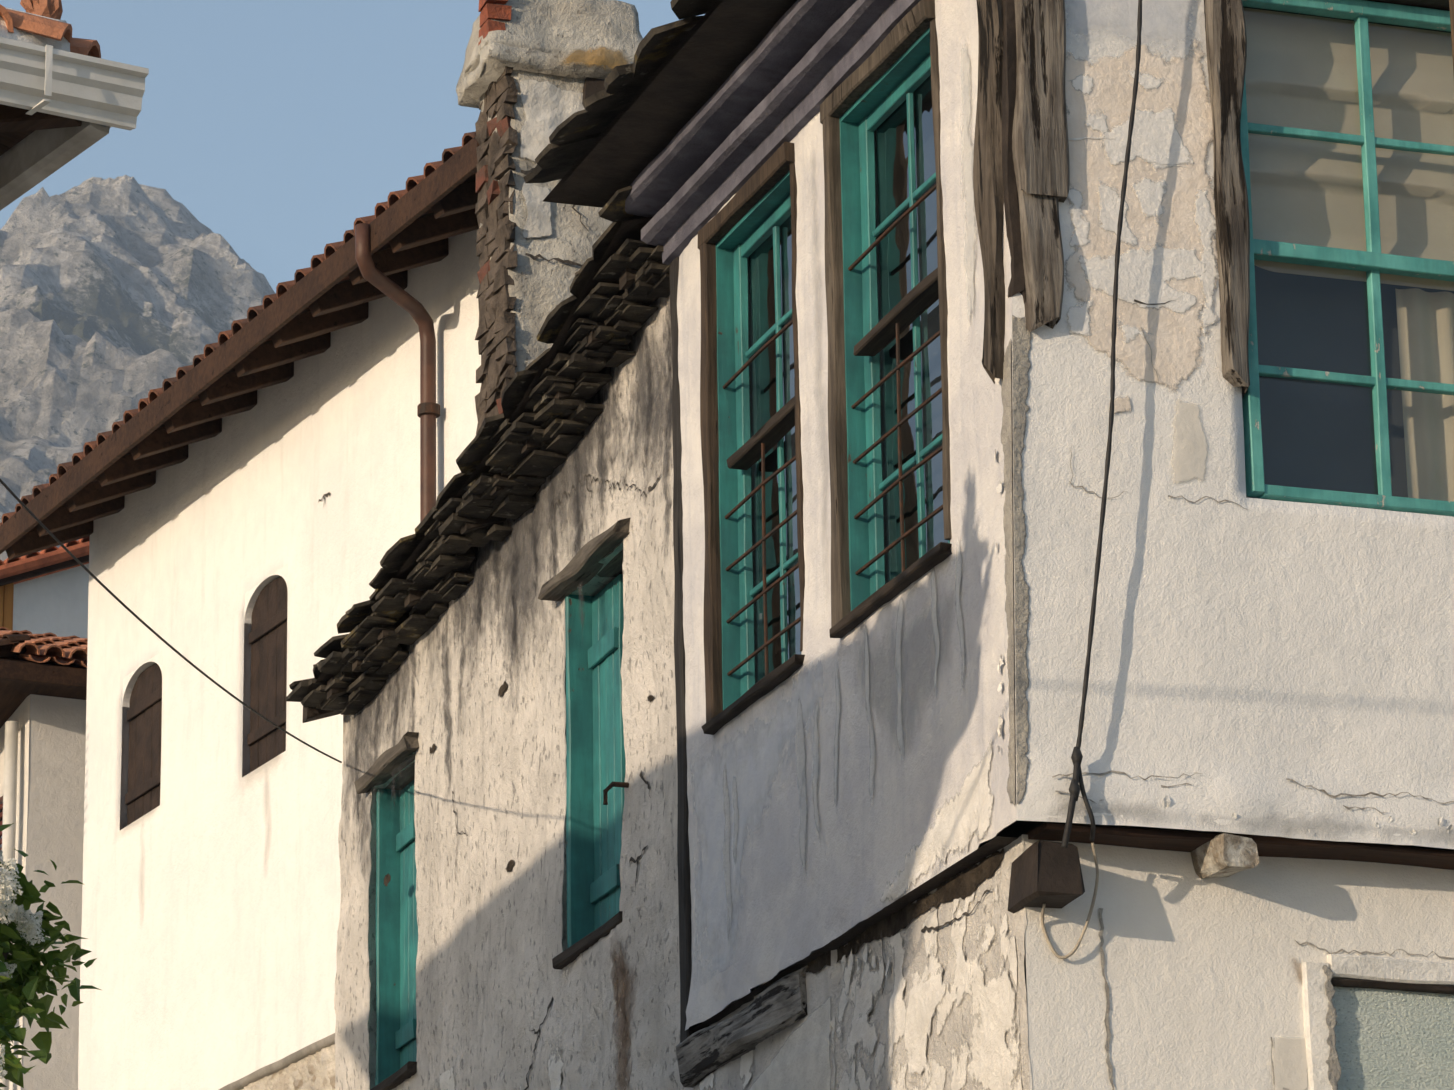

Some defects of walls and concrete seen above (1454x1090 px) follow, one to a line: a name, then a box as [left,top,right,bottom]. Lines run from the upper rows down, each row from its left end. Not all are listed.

leakage [346,301,673,847]
flaking render [802,315,1031,1090]
crack [1069,445,1130,498]
flaking render [1065,40,1220,483]
crack [1168,495,1250,510]